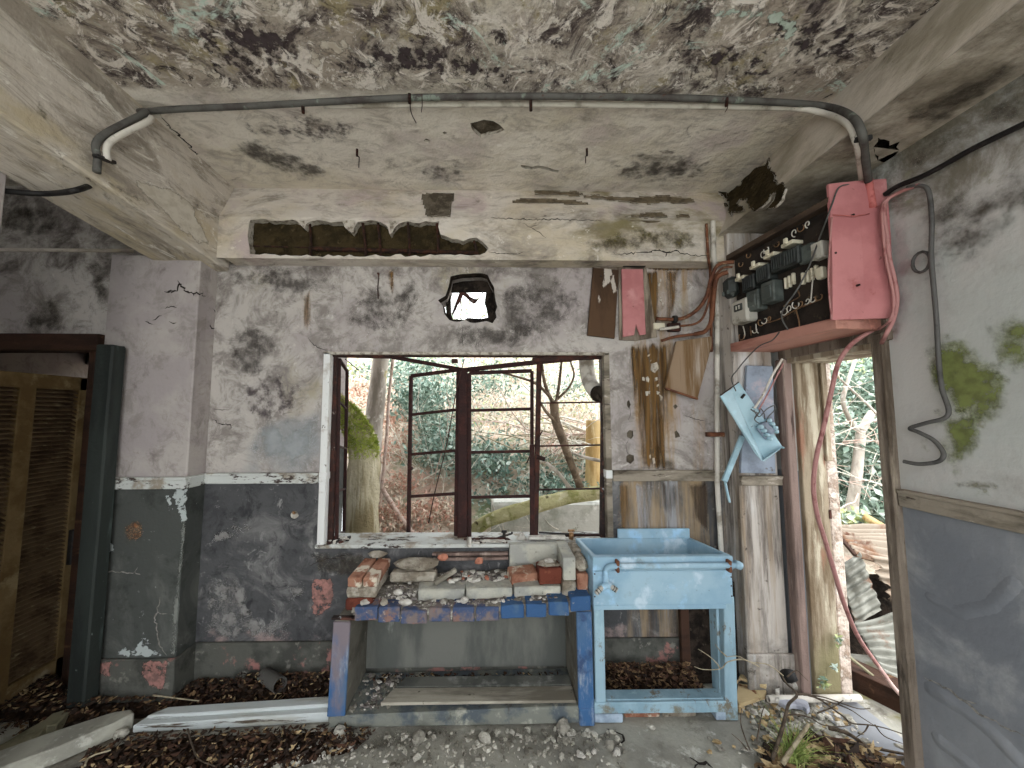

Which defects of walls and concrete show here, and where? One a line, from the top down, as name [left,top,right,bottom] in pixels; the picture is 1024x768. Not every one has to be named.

crack [162,118,214,170]
spalling [471,120,504,138]
spalling [248,193,489,257]
spalling [512,190,695,223]
spalling [718,157,788,217]
crack [613,249,707,257]
crack [145,280,215,329]
damp [237,272,313,321]
hole [438,273,497,323]
damp [457,287,575,345]
mould [233,330,274,373]
damp [247,376,309,458]